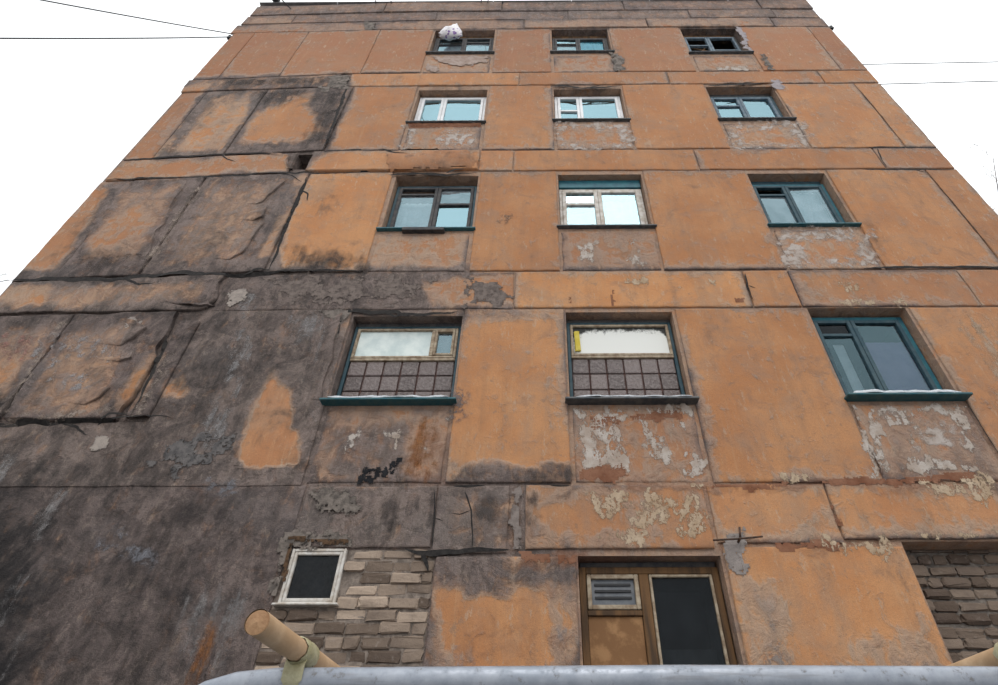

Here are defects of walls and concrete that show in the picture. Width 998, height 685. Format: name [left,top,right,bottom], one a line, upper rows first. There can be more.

crack [0,89,477,285]
spalling [263,271,438,339]
spalling [460,276,514,309]
flaking render [573,403,714,548]
peeling [853,405,879,478]
flaking render [918,471,995,509]
crack [405,485,509,571]